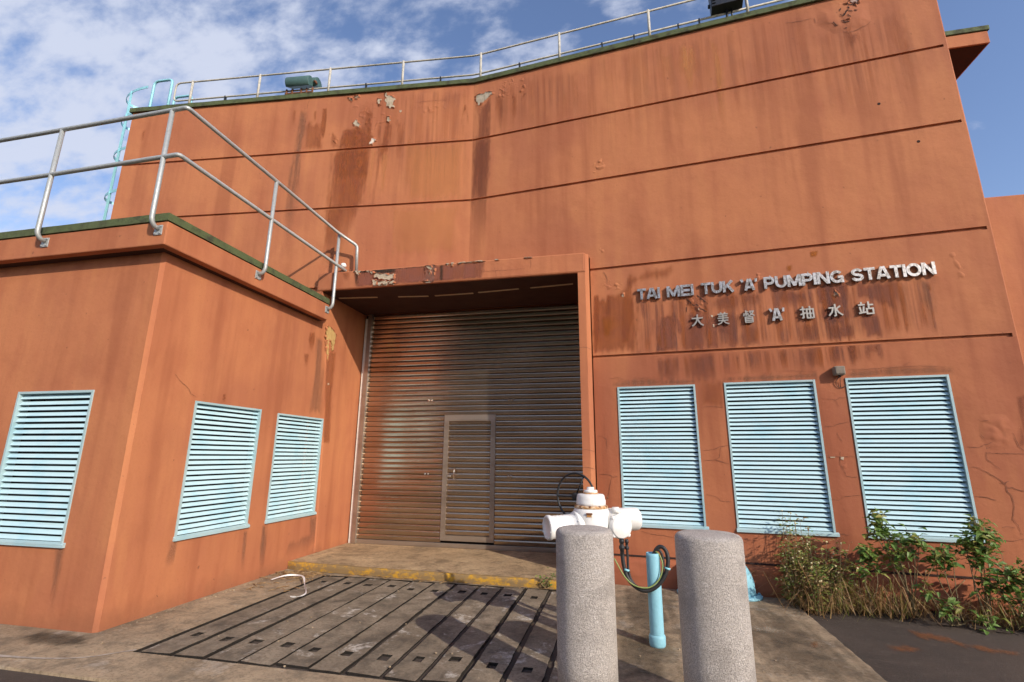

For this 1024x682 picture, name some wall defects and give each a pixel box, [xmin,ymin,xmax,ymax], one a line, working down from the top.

peeling [376,91,402,124]
peeling [474,90,494,105]
water stain [475,101,490,189]
peeling [354,270,396,286]
spalling [422,259,500,283]
peeling [325,324,337,362]
water stain [645,294,756,368]
water stain [774,283,908,358]
crack [973,420,1023,541]